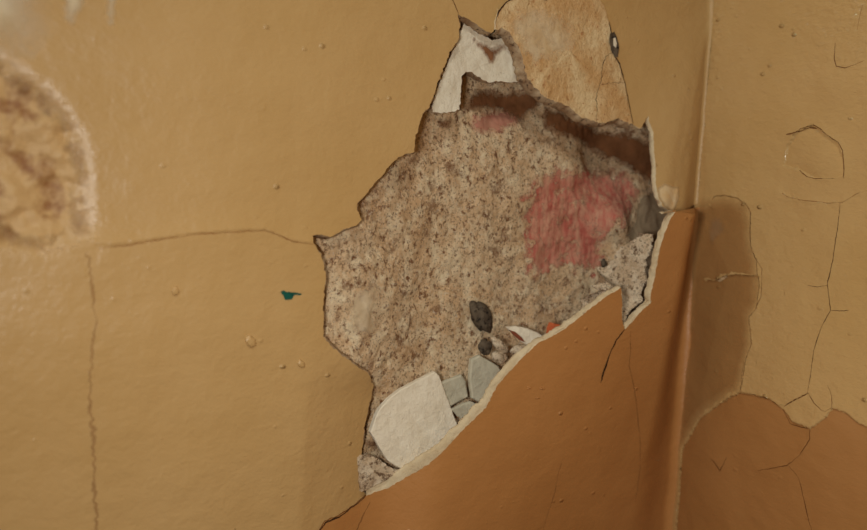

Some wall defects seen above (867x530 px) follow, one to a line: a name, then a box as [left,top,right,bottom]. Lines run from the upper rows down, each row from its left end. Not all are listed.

crack [85,230,314,530]
flaking render [313,0,679,469]
peeling [676,393,867,530]
crack [757,191,864,530]